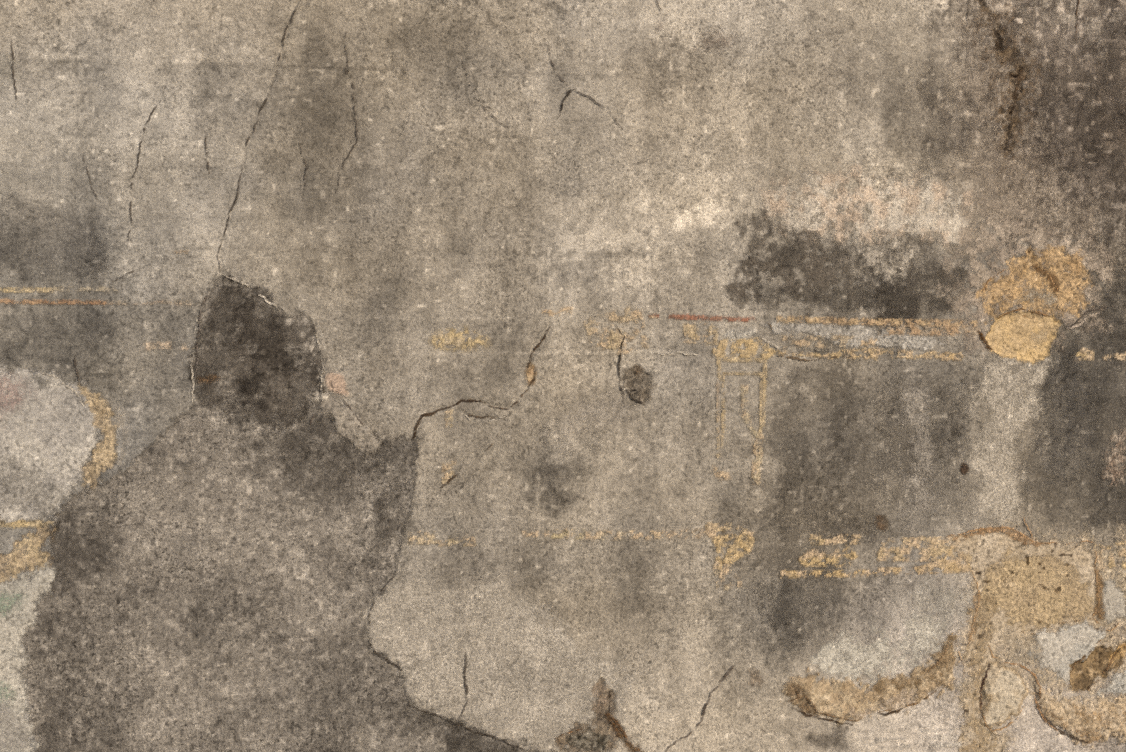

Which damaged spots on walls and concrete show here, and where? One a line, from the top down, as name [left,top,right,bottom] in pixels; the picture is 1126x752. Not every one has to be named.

crack [217,9,296,268]
crack [336,32,358,192]
crack [195,296,207,383]
damp [188,275,356,488]
crack [412,327,550,450]
spalling [584,246,1100,484]
damp [725,0,1126,533]
peeling [1077,348,1126,360]
damp [363,576,635,750]
spalling [555,679,640,752]
spalling [781,518,1126,752]